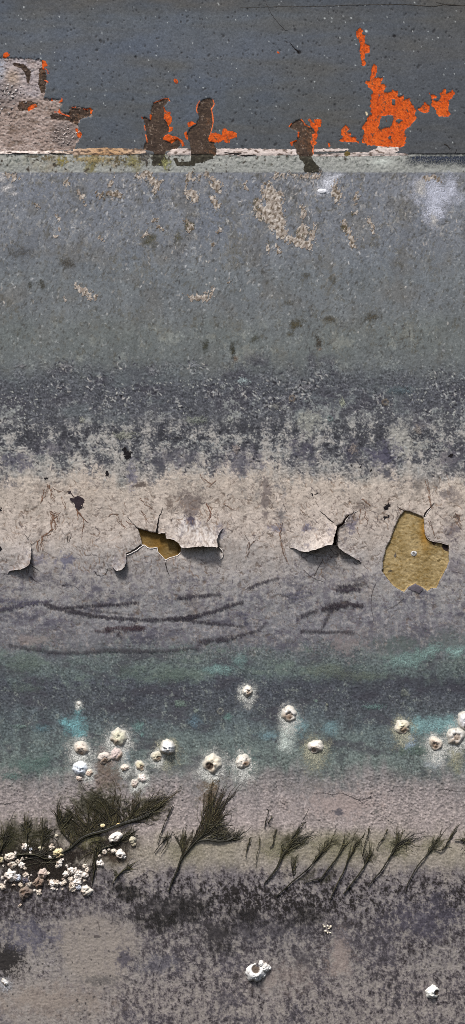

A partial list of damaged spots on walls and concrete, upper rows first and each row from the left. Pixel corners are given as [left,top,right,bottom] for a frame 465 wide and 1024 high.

spalling [0,52,146,156]
peeling [167,148,198,156]
rust [141,98,237,166]
peeling [216,148,297,157]
rust [289,119,323,173]
peeling [158,520,223,548]
peeling [290,511,361,562]
peeling [7,539,31,574]
peeling [112,551,126,571]